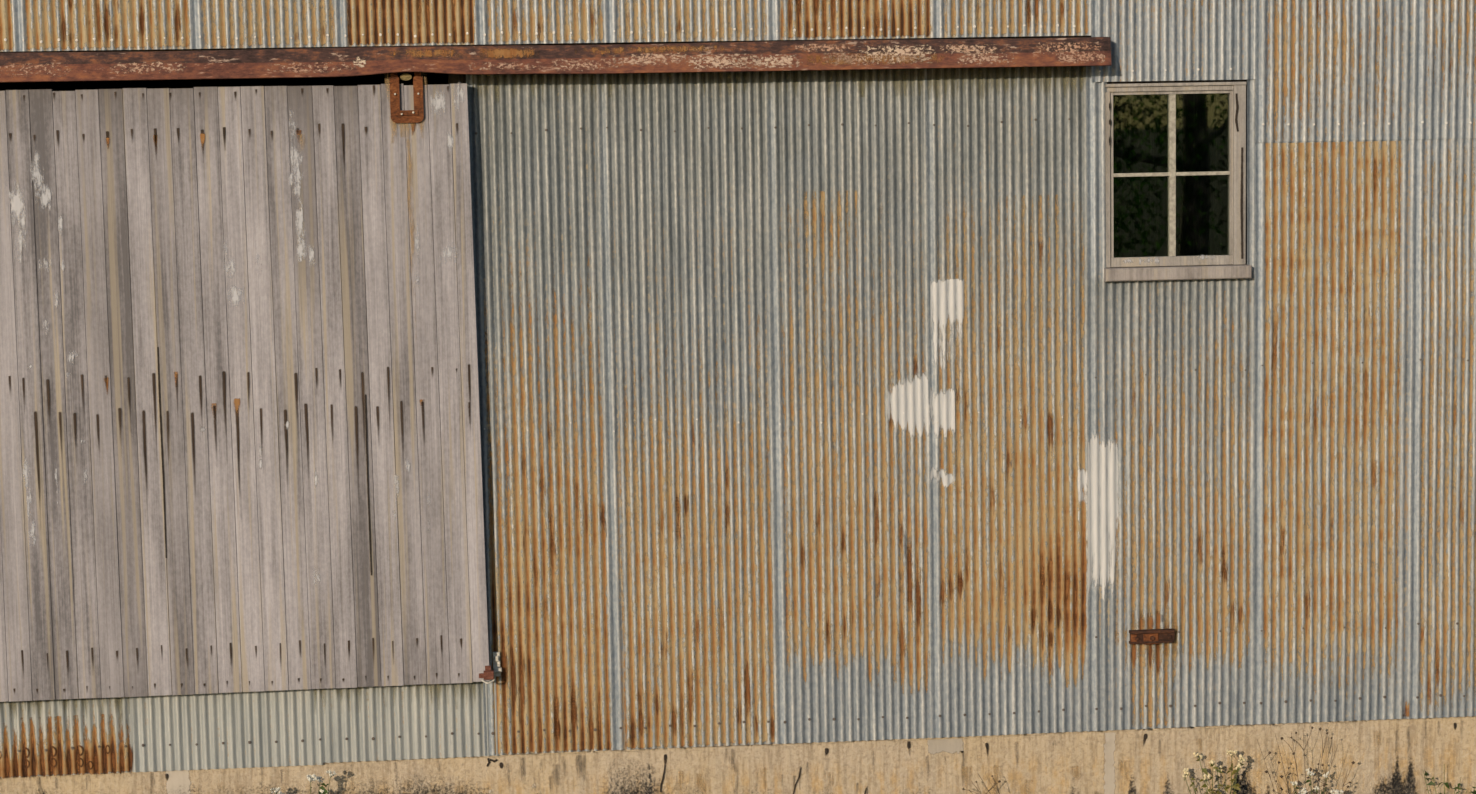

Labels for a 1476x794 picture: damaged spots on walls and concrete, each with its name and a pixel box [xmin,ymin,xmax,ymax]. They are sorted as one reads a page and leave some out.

rust [0,0,1088,65]
rust [1427,0,1476,89]
rust [1115,0,1403,745]
rust [1403,152,1476,717]
rust [485,191,1087,768]
rust [0,714,133,779]
leakage [363,784,487,794]
leakage [607,773,664,794]
leakage [1232,771,1269,794]
leakage [1375,757,1417,794]